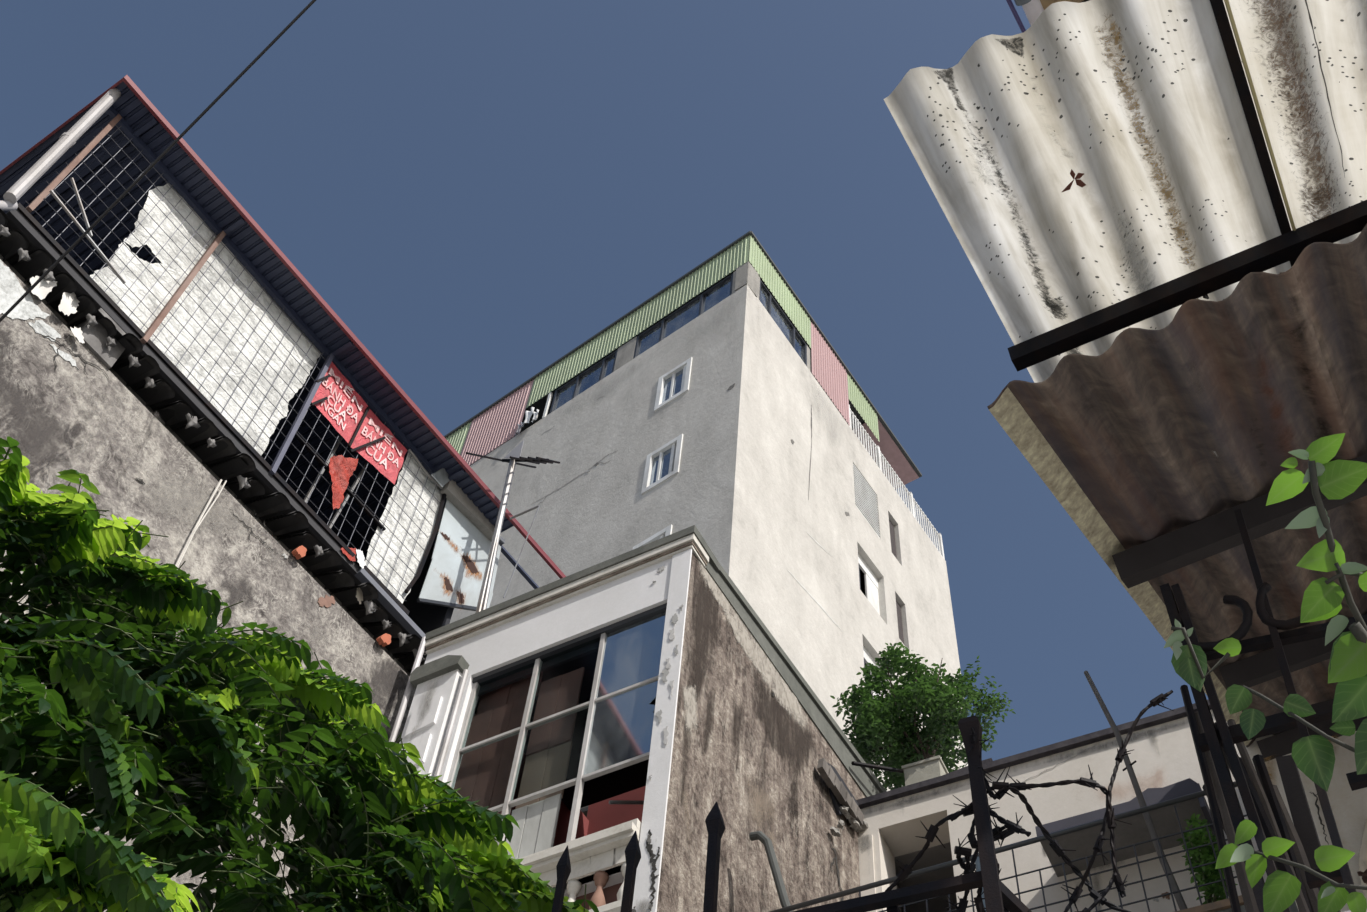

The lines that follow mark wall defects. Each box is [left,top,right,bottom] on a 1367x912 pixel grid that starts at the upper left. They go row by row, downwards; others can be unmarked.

water stain [1105,16,1125,57]
water stain [1300,186,1335,221]
peeling [0,260,79,370]
water stain [1043,297,1066,319]
rust [440,575,464,604]
rust [441,532,482,579]
peeling [661,605,697,731]
water stain [682,571,721,801]
peeling [699,561,806,726]
water stain [752,675,812,819]
crack [646,830,660,905]